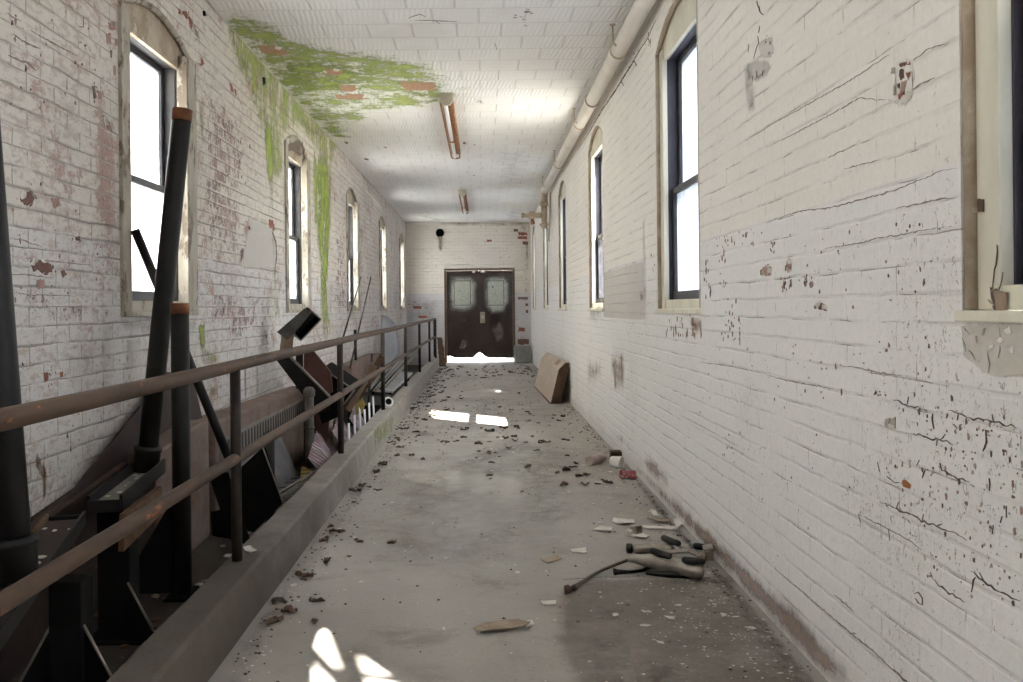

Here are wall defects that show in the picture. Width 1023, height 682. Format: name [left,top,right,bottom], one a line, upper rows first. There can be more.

crack [766,55,891,147]
spalling [891,58,913,107]
crack [913,43,948,89]
crack [828,144,877,169]
crack [769,168,953,222]
spalling [12,182,83,303]
spalling [666,314,702,339]
crack [703,362,1016,534]
crack [858,462,967,550]
crack [914,571,1020,605]